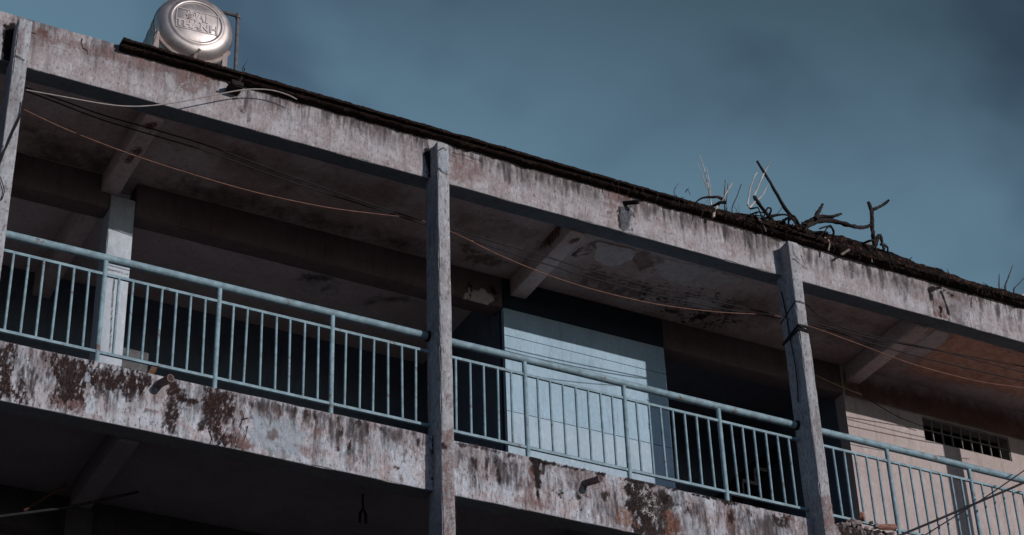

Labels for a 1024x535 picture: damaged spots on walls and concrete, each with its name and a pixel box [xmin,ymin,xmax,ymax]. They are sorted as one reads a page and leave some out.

damp [303,103,433,177]
damp [617,194,770,256]
peeling [540,226,743,290]
peeling [463,281,497,305]